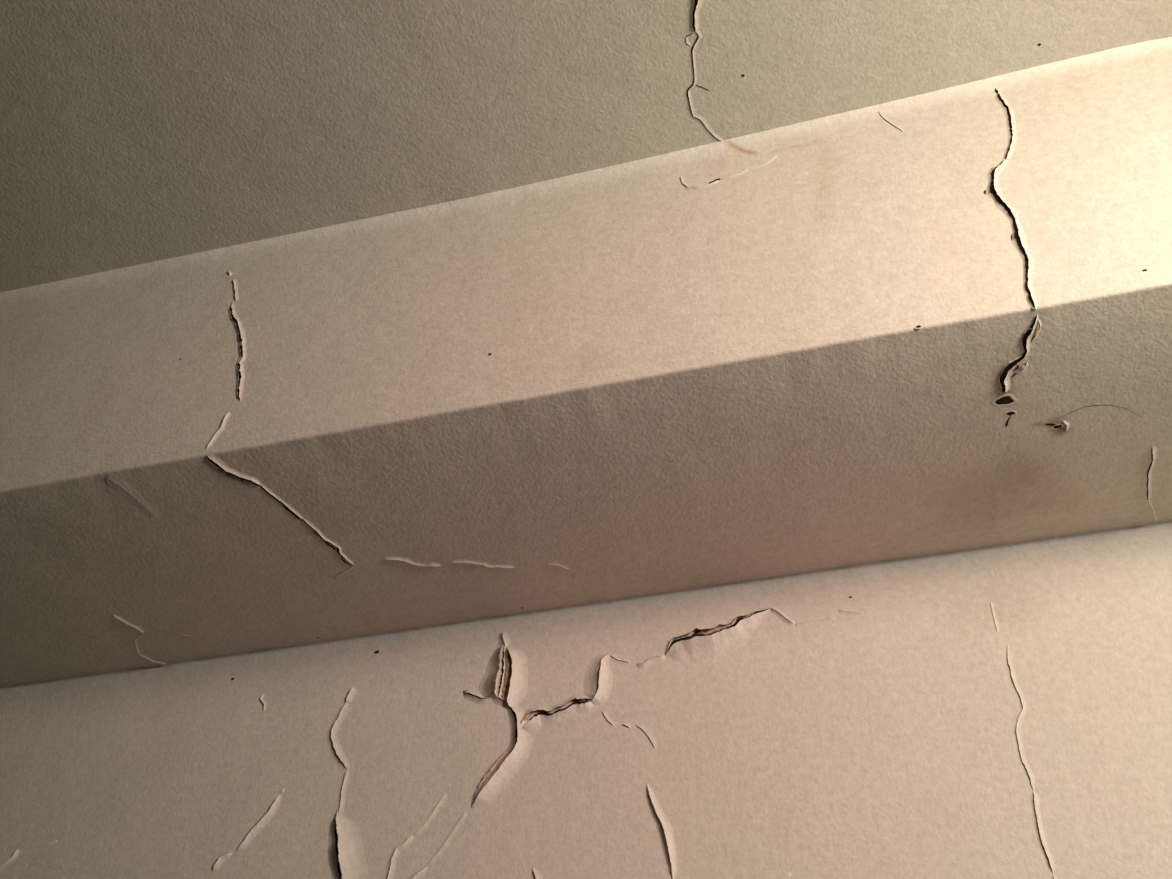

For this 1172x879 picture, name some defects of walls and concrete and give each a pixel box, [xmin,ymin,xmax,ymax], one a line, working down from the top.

crack [686,0,723,141]
crack [878,111,904,132]
crack [984,88,1042,427]
crack [206,271,355,578]
crack [383,556,515,568]
crack [212,788,285,871]
peeling [327,687,368,879]
peeling [463,607,864,809]
crack [990,602,1058,879]